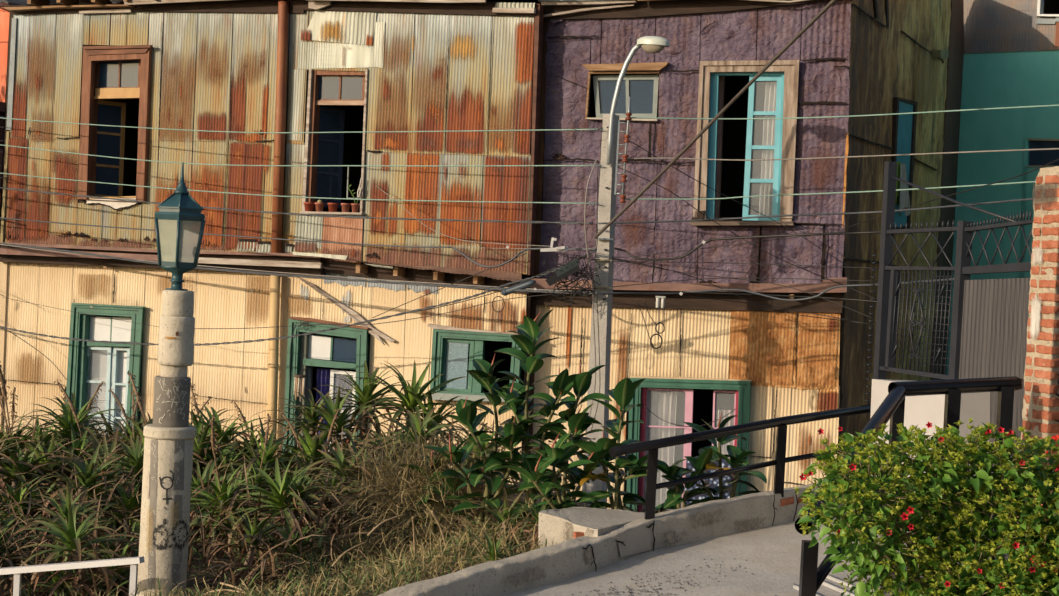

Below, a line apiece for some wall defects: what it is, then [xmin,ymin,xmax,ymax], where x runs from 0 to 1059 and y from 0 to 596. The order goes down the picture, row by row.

corrosion [6,48,152,248]
corrosion [155,43,271,253]
corrosion [284,21,534,273]